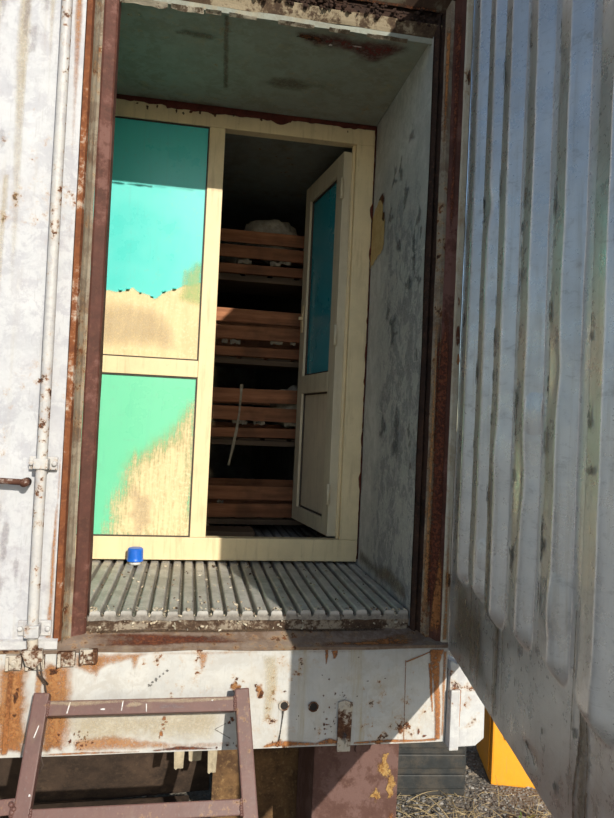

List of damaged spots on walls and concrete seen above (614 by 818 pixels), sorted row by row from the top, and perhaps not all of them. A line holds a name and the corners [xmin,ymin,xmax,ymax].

peeling [120,0,257,21]
peeling [370,194,385,268]
peeling [103,267,202,361]
peeling [109,408,196,537]
rust [423,311,448,630]
rust [0,671,24,755]
rust [35,666,70,701]
rust [43,717,120,755]
rust [264,707,337,748]
rust [354,649,461,744]